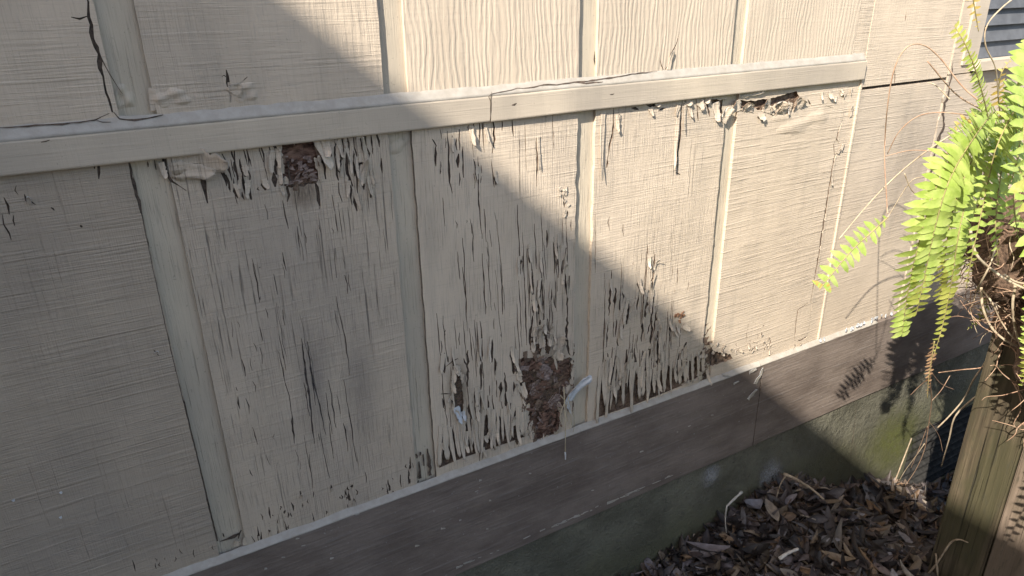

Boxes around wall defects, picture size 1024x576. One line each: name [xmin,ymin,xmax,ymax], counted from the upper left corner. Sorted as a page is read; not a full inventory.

crack [0,0,162,128]
peeling [164,148,232,203]
spalling [276,140,334,206]
spalling [632,88,853,175]
crack [223,50,675,542]
crack [128,159,218,569]
spalling [437,272,770,467]